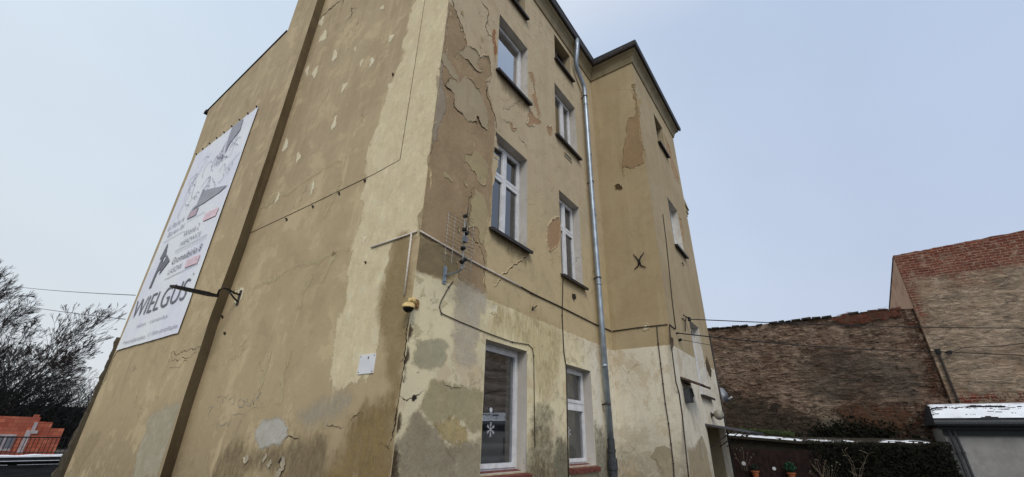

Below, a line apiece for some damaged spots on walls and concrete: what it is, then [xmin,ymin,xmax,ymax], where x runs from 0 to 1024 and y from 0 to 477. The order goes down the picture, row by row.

flaking render [509,71,553,136]
flaking render [614,83,646,190]
peeling [330,0,499,392]
crack [467,229,528,292]
flaking render [546,216,561,253]
water stain [214,237,483,477]
crack [386,317,420,475]